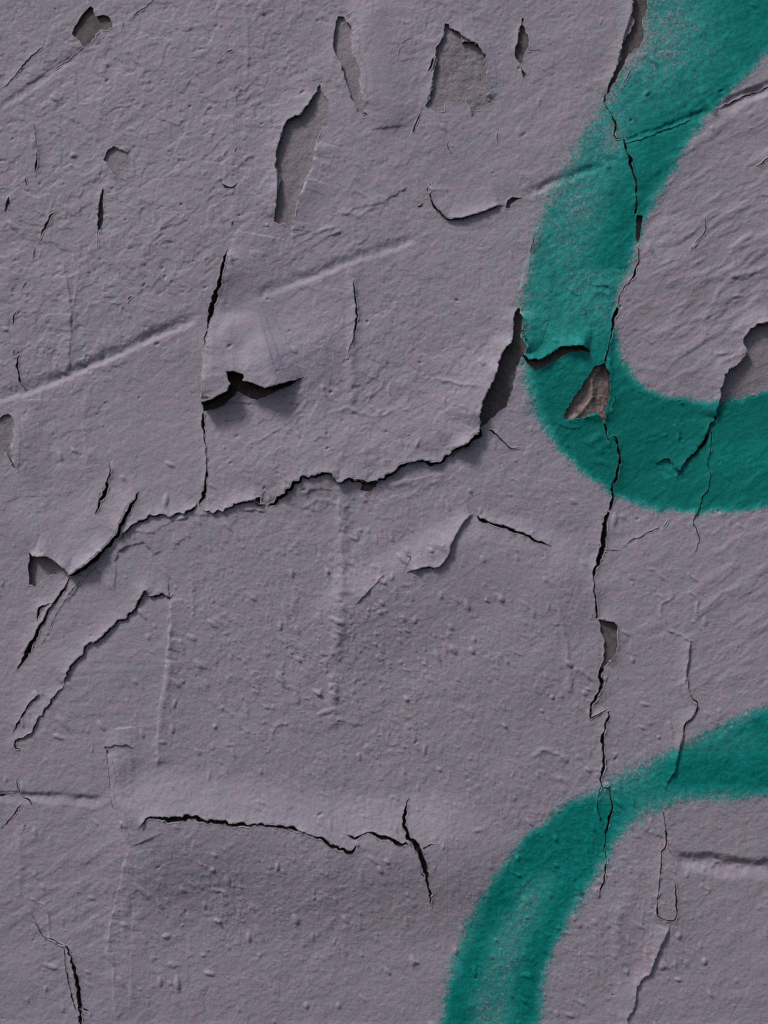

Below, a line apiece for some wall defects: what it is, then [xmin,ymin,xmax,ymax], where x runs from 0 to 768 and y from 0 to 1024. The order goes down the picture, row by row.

peeling [52,4,114,73]
peeling [264,83,330,229]
peeling [410,22,497,135]
crack [603,64,768,215]
peeling [201,288,306,413]
peeling [444,307,612,449]
peeling [695,305,768,422]
crack [11,212,521,751]
crack [105,749,440,910]
crack [589,666,614,898]
crack [616,639,700,1024]
crack [30,912,90,1024]